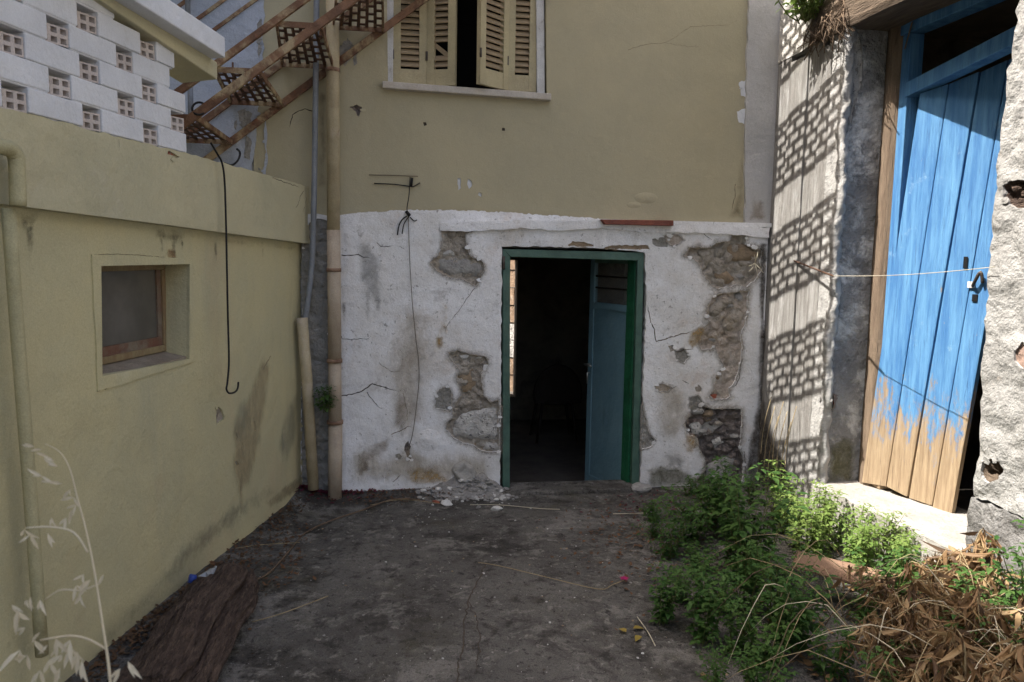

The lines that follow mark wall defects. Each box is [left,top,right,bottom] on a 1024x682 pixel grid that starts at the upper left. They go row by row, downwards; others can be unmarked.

flaking render [1001,180,1024,208]
flaking render [430,231,486,287]
flaking render [568,234,764,485]
crack [648,311,690,352]
crack [342,364,410,435]
flaking render [433,349,502,454]
flaking render [983,456,1004,482]